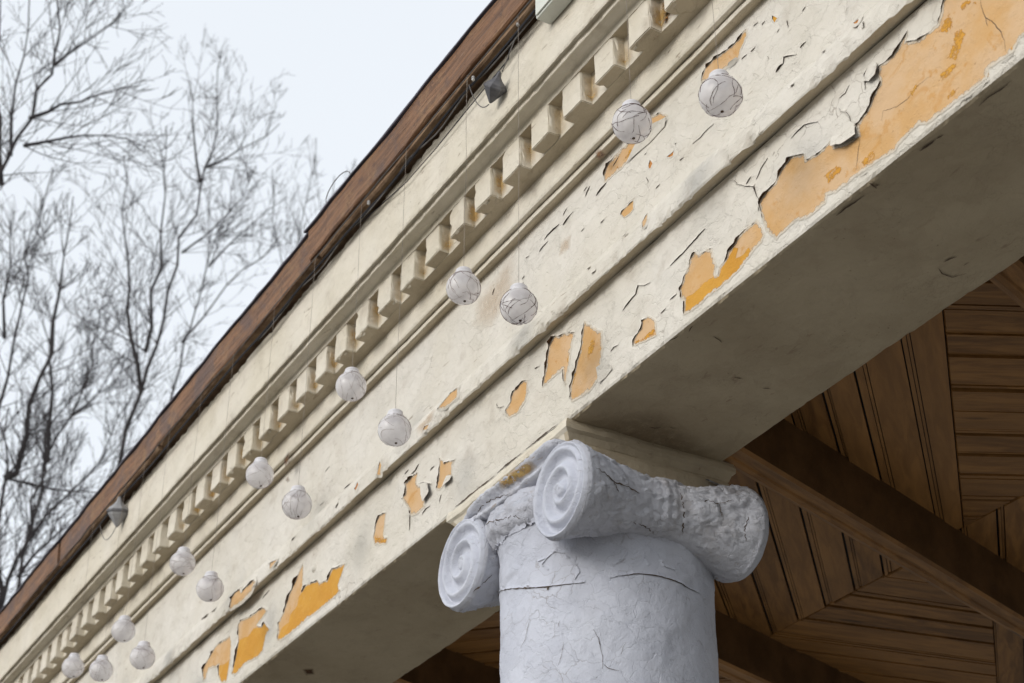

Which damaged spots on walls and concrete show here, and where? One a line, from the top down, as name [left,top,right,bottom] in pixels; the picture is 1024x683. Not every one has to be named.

crack [741,7,825,87]
crack [791,67,880,216]
peeling [678,0,1024,316]
crack [670,228,705,265]
peeling [505,378,529,419]
peeling [542,319,612,403]
crack [622,281,650,310]
peeling [632,315,658,347]
peeling [401,456,456,517]
crack [405,426,555,530]
peeling [201,562,346,683]
crack [473,570,699,597]